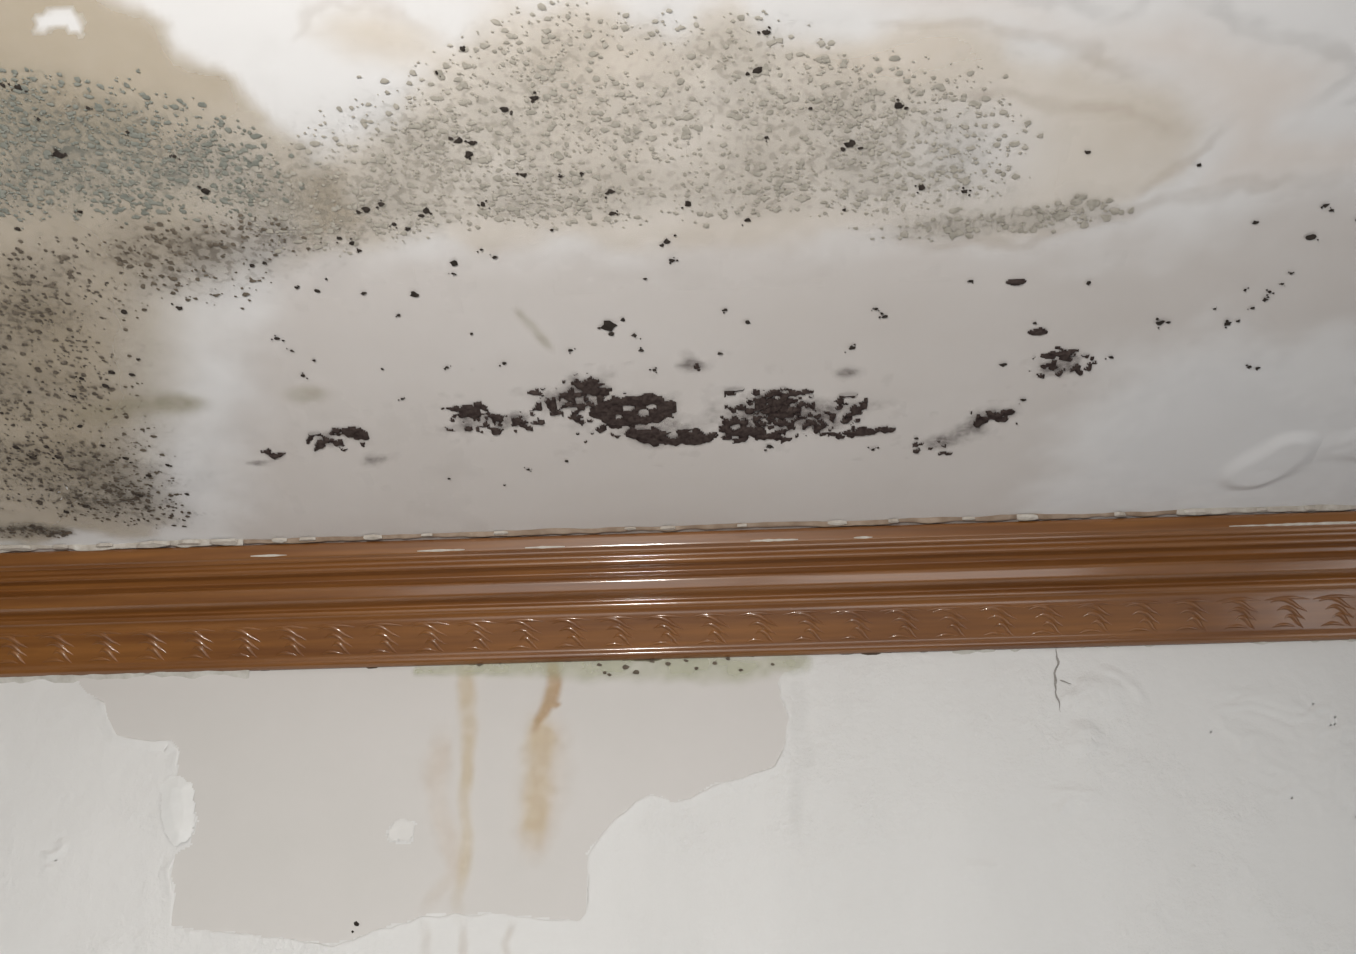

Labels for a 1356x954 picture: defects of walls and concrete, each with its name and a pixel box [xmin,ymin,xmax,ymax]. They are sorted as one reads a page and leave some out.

water stain [0,0,1134,538]
peeling [78,655,807,954]
crack [1053,650,1071,710]